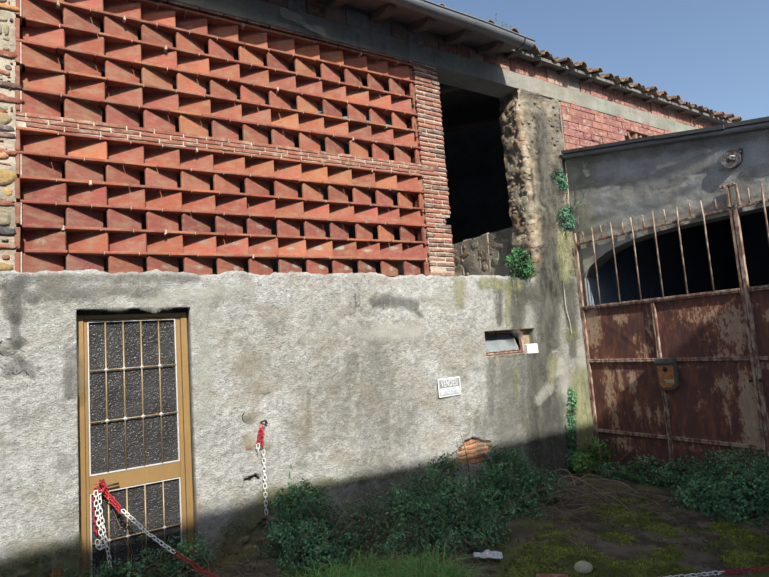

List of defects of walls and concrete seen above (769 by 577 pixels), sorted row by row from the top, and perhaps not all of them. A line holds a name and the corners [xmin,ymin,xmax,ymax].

flaking render [457,437,490,465]
leakage [496,108,578,480]